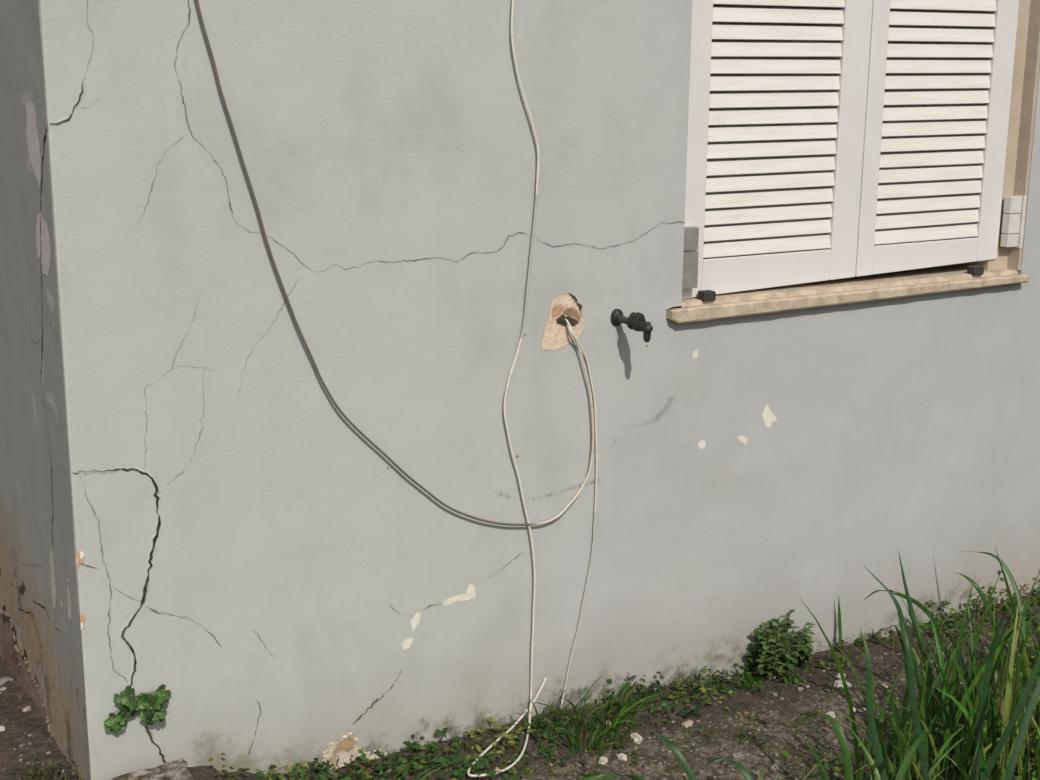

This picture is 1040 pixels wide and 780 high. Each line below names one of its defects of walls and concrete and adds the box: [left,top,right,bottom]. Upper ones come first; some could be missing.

peeling [17,76,41,189]
crack [29,57,91,311]
peeling [36,212,57,336]
flaking render [541,292,584,351]
peeling [760,400,780,431]
crack [49,441,184,686]
damp [0,436,90,780]
peeling [399,609,424,653]
peeling [437,581,478,608]
crack [145,725,166,763]
flaking render [321,731,388,772]